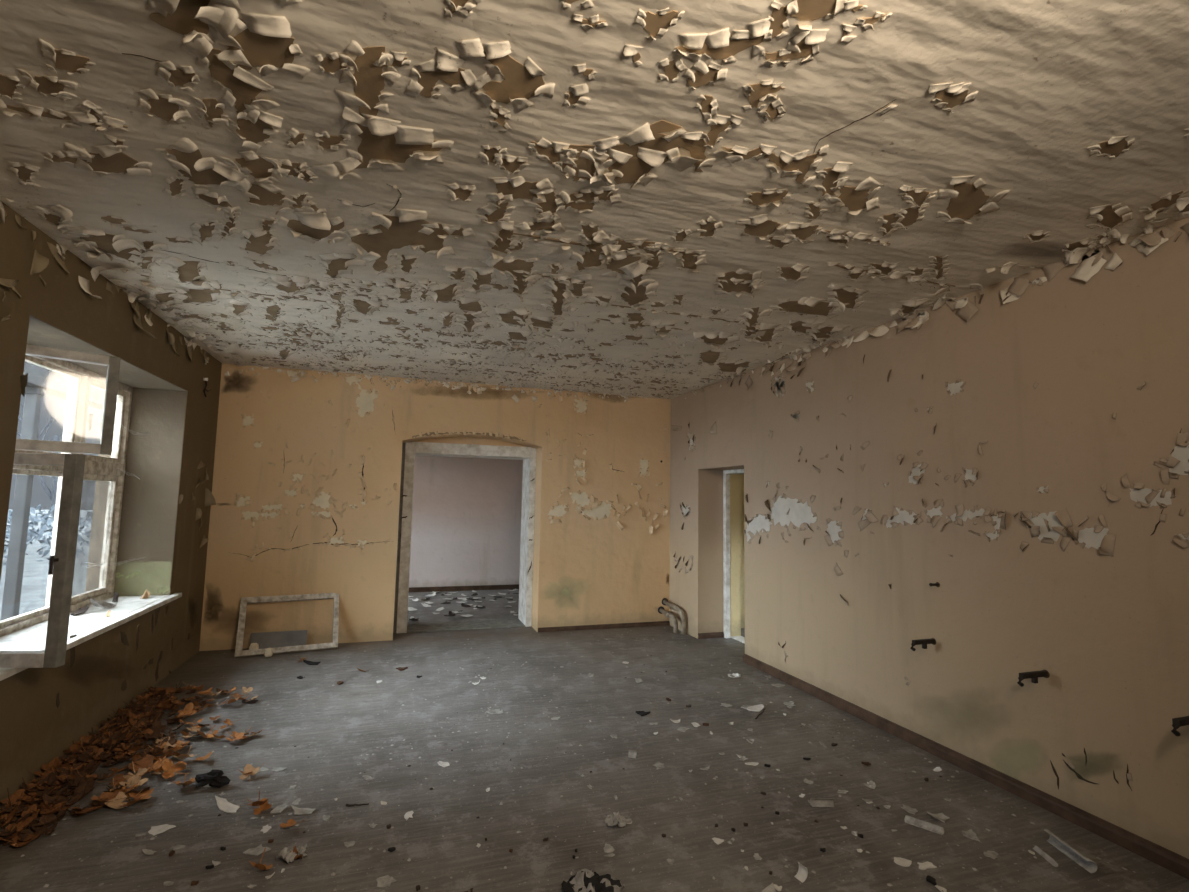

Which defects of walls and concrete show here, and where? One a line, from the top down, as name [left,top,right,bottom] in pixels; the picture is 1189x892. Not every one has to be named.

crack [813,99,898,154]
crack [230,495,407,560]
peeling [548,448,691,535]
peeling [744,450,1116,576]
peeling [1104,441,1189,516]